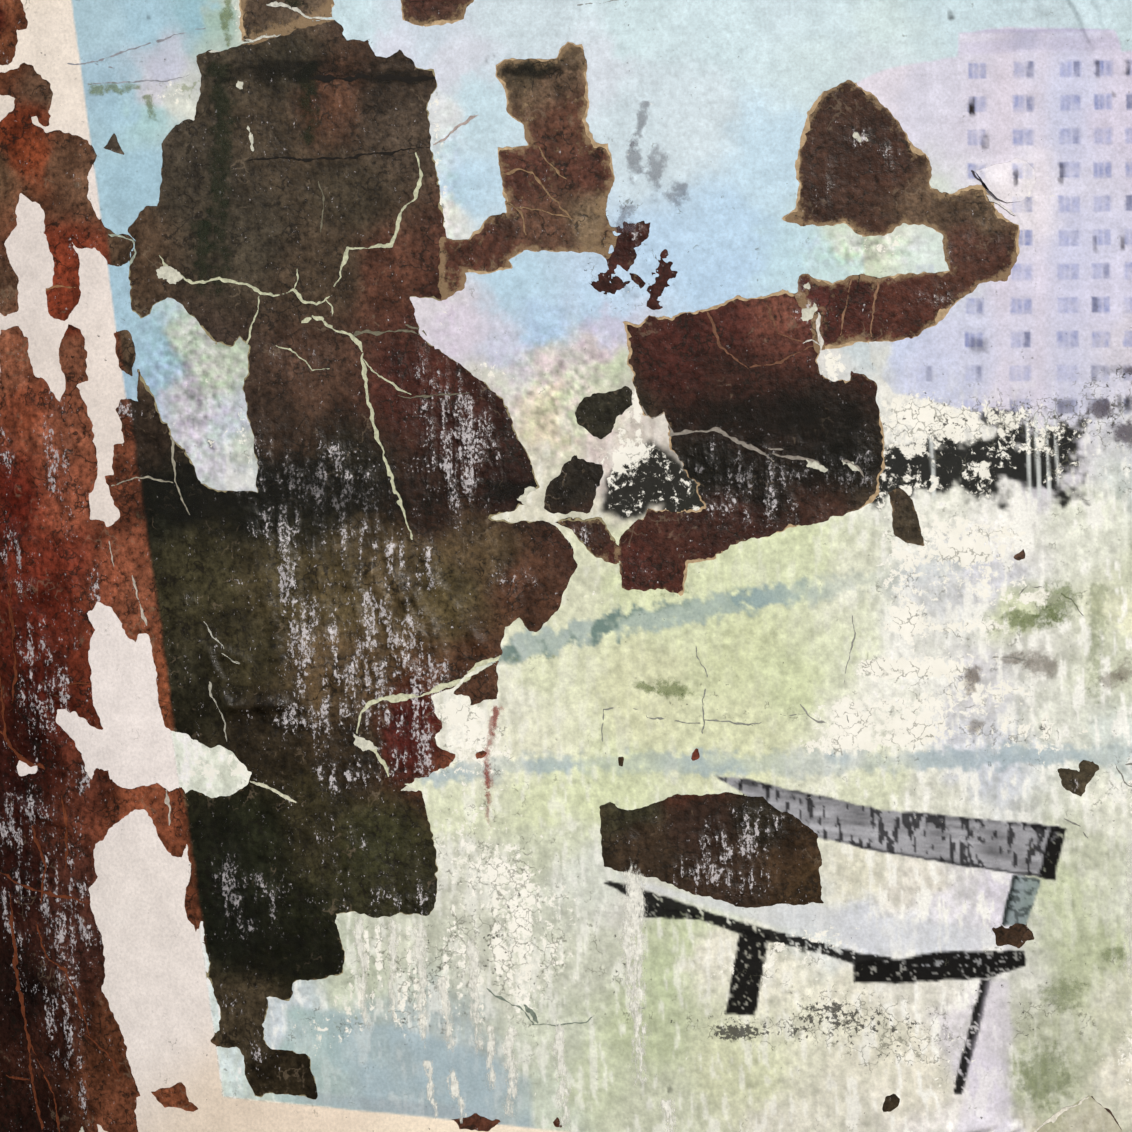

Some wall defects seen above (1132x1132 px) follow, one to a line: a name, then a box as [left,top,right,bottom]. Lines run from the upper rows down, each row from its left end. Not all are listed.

crack [309,74,435,84]
crack [109,115,478,540]
peeling [557,80,1020,596]
peeling [0,0,650,1132]
peeling [599,792,824,908]